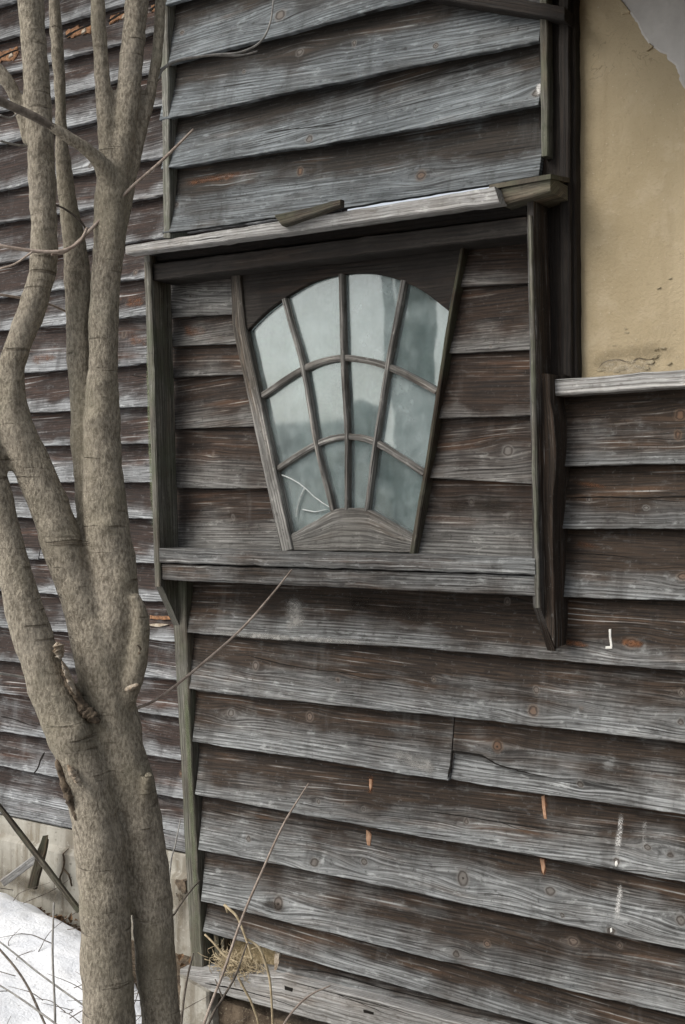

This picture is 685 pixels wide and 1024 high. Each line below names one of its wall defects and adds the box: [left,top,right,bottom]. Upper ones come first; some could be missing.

flaking render [619,0,685,88]
crack [447,751,553,779]